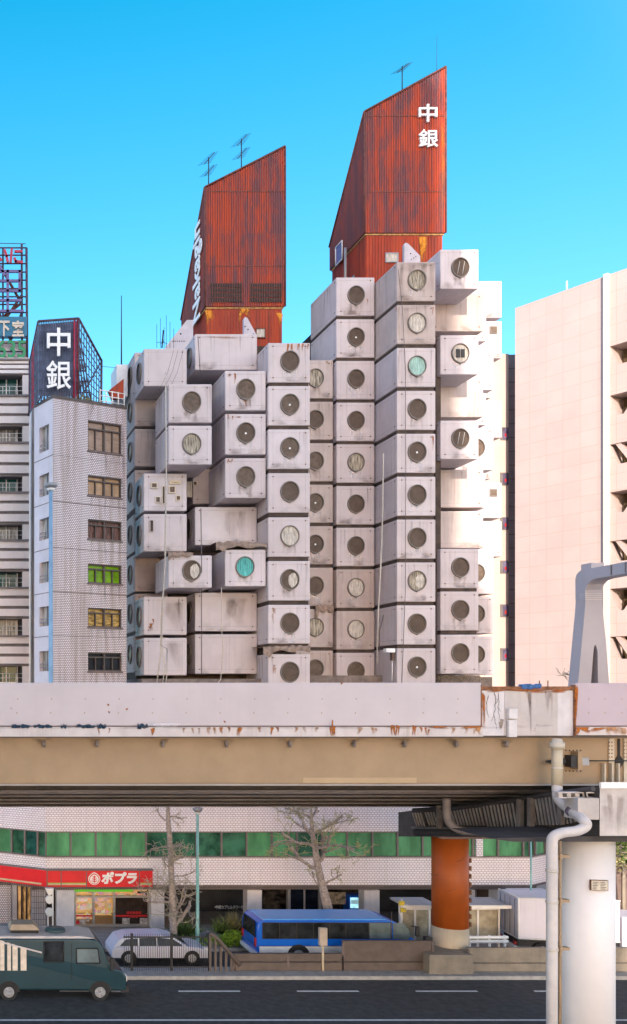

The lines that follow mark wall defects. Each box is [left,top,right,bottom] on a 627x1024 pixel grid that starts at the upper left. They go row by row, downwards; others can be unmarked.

rust [391,686,625,734]